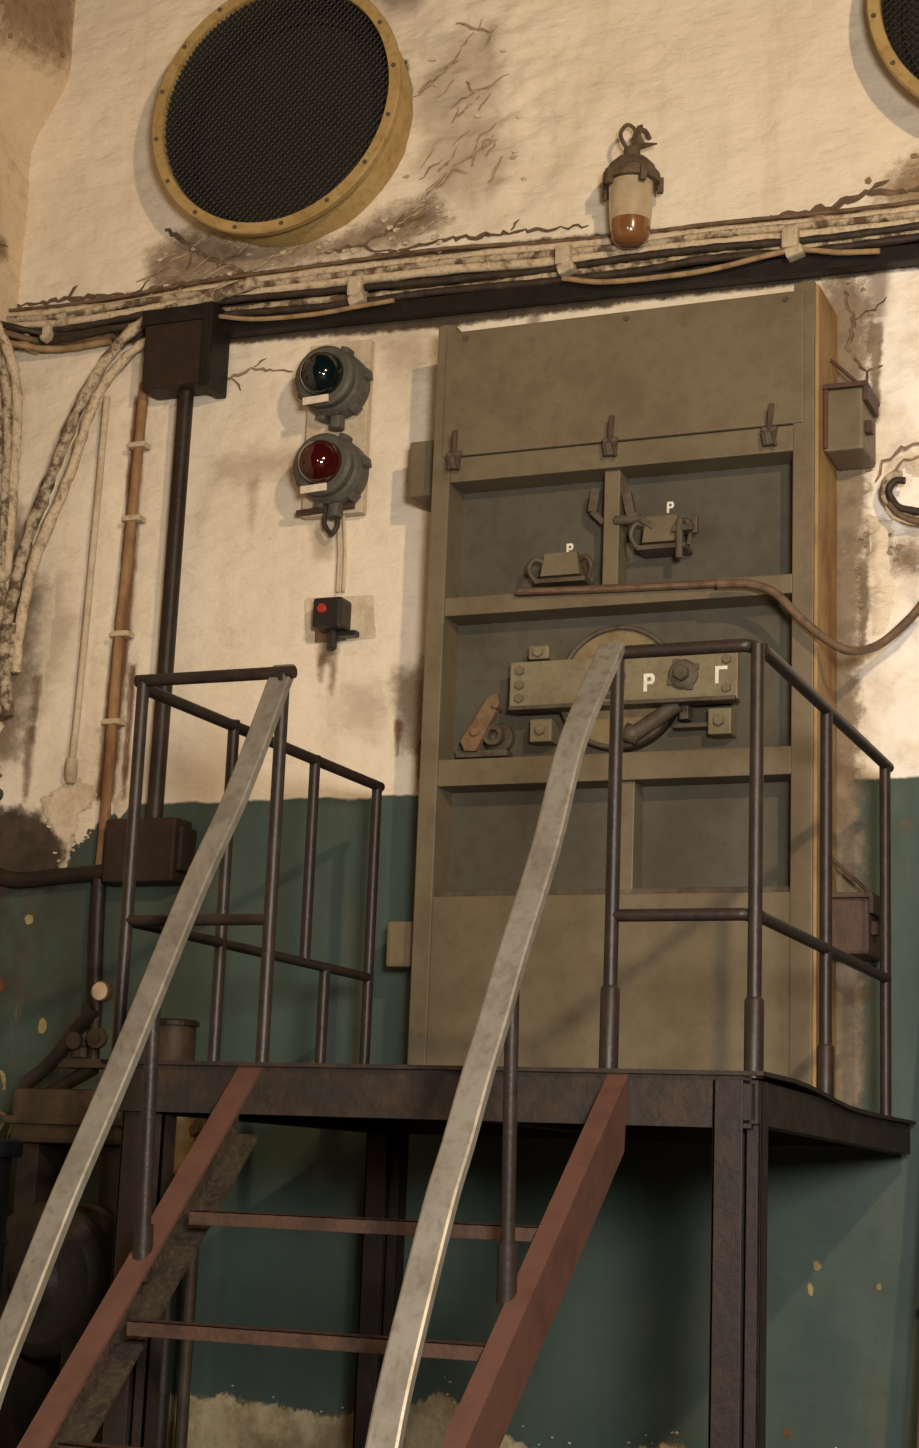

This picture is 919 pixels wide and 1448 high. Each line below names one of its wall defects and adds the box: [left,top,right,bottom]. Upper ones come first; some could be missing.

crack [456,19,492,33]
crack [451,81,491,109]
crack [843,290,886,381]
damp [0,520,67,898]
peeling [167,1385,354,1448]
peeling [402,1377,459,1448]
peeling [500,1425,571,1448]
peeling [626,1431,686,1448]